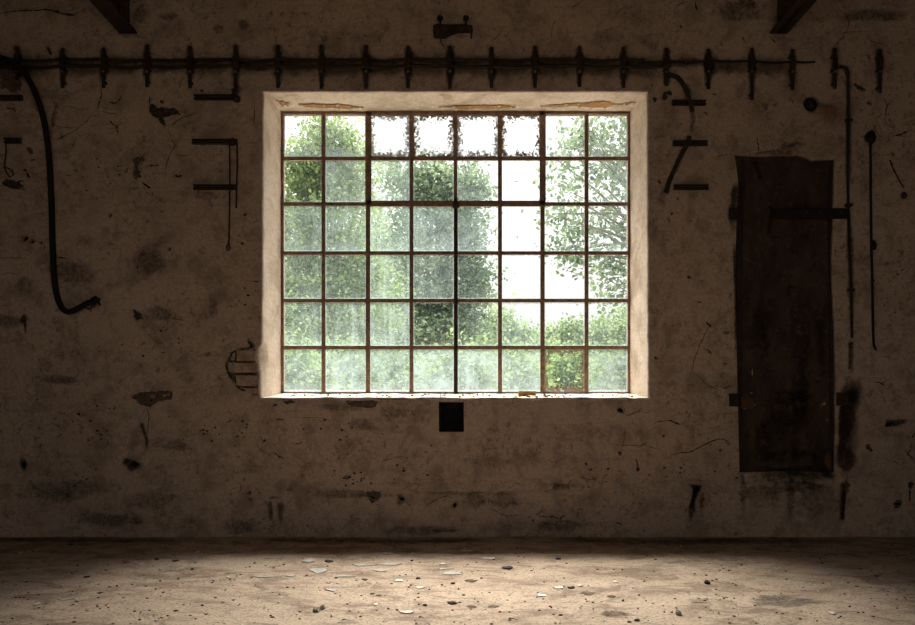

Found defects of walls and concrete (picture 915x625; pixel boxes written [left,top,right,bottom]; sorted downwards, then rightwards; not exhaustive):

flaking render [149,97,181,128]
peeling [276,100,363,111]
peeling [540,101,637,110]
flaking render [225,342,258,396]
flaking render [130,390,173,435]
crack [614,408,730,471]
water stain [689,485,701,518]